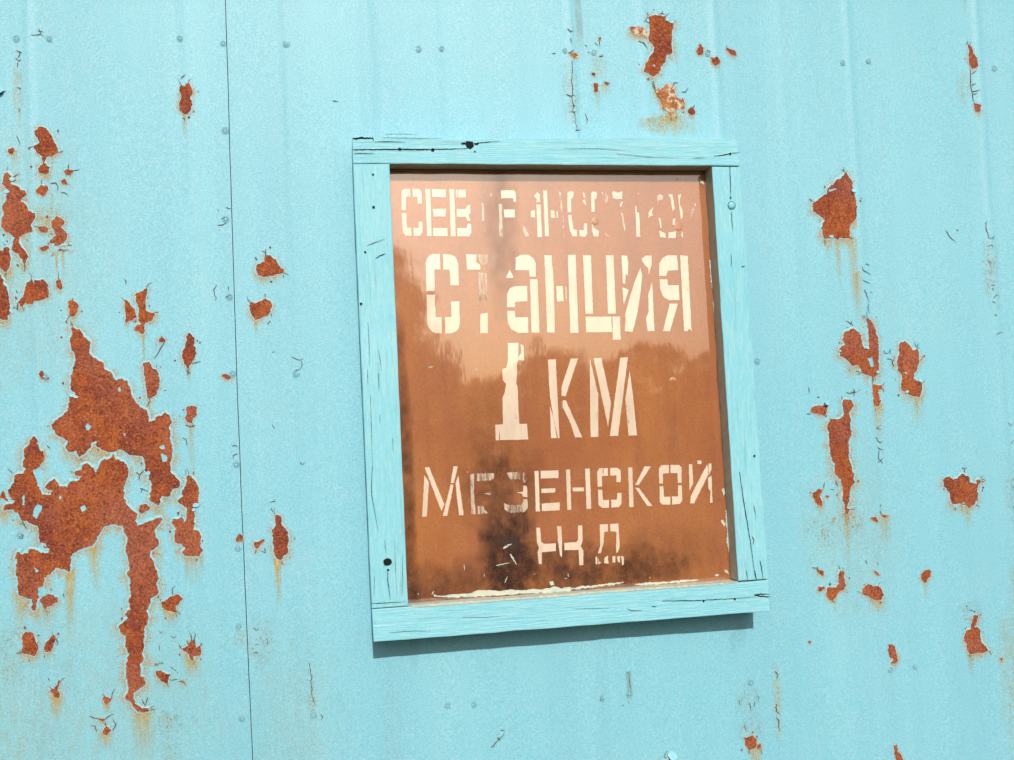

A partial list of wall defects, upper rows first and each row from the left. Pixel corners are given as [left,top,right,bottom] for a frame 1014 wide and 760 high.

rust [178,75,199,121]
rust [629,10,687,131]
rust [0,125,74,323]
rust [810,168,862,251]
rust [254,246,289,283]
rust [119,284,158,345]
rust [807,315,925,537]
rust [2,298,205,726]
rust [270,500,295,577]
rust [942,467,985,514]
rust [825,564,885,604]
rust [963,605,992,656]